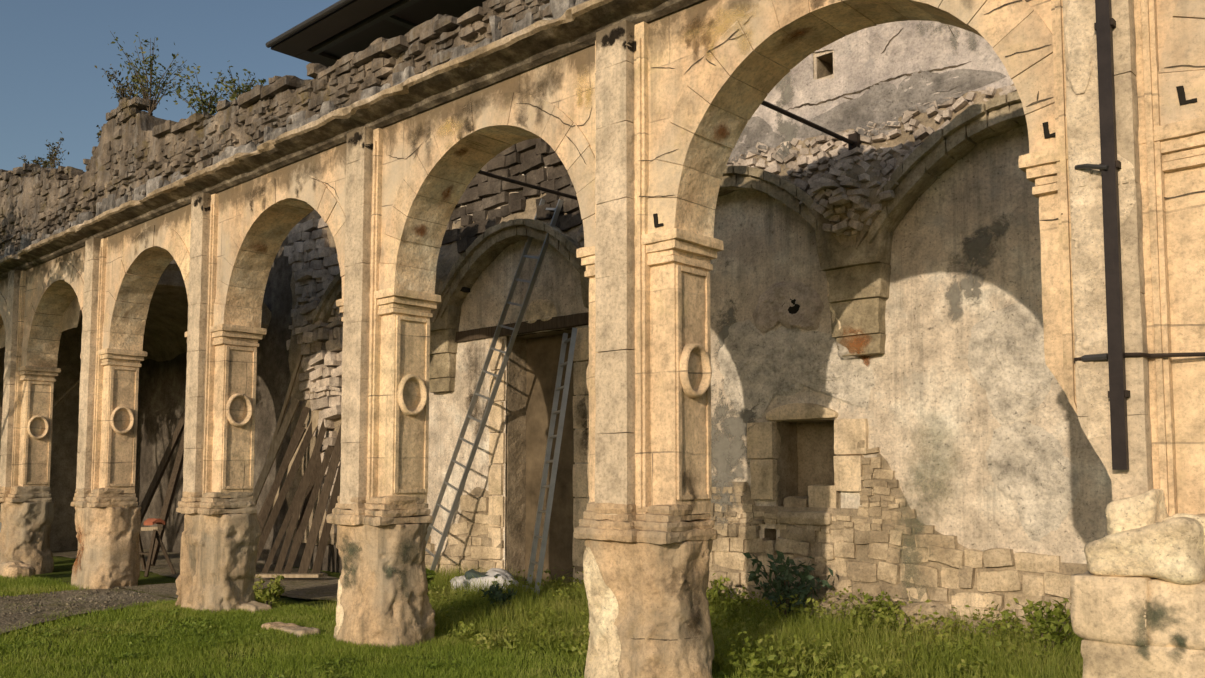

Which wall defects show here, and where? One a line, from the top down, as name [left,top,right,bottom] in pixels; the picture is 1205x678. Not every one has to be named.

crack [984,0,1031,15]
crack [652,16,752,73]
crack [788,28,971,110]
crack [1005,44,1052,57]
crack [517,103,592,164]
flaking render [726,69,1006,166]
crack [1026,91,1053,107]
water stain [946,216,1009,321]
peeling [717,281,875,419]
corrosion [843,329,869,366]
water stain [341,539,360,587]